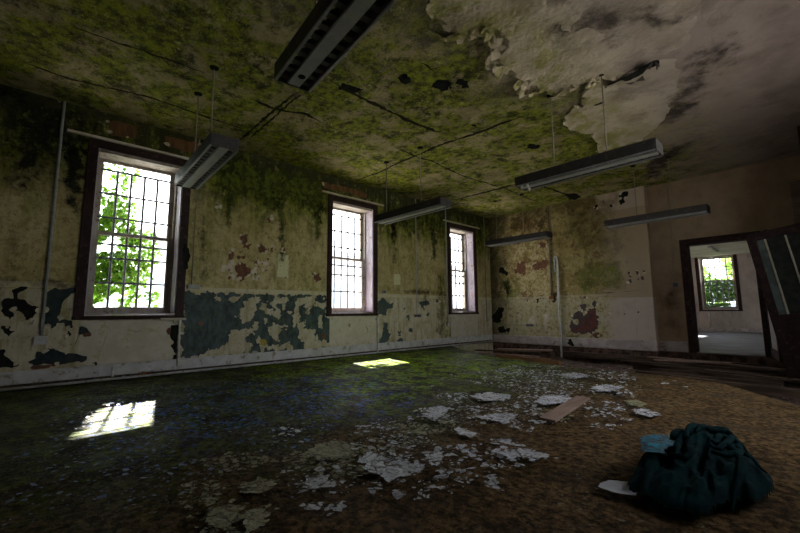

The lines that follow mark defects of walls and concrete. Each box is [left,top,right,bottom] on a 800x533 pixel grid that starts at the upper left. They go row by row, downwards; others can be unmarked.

leakage [432,79,469,92]
peeling [425,0,702,153]
leakage [660,43,738,124]
leakage [0,87,99,213]
crack [331,81,574,203]
peeling [221,234,286,281]
spalling [514,258,548,276]
peeling [1,286,91,340]
peeling [166,290,333,361]
peeling [378,297,413,343]
spalling [566,296,600,346]
peeling [0,343,97,370]